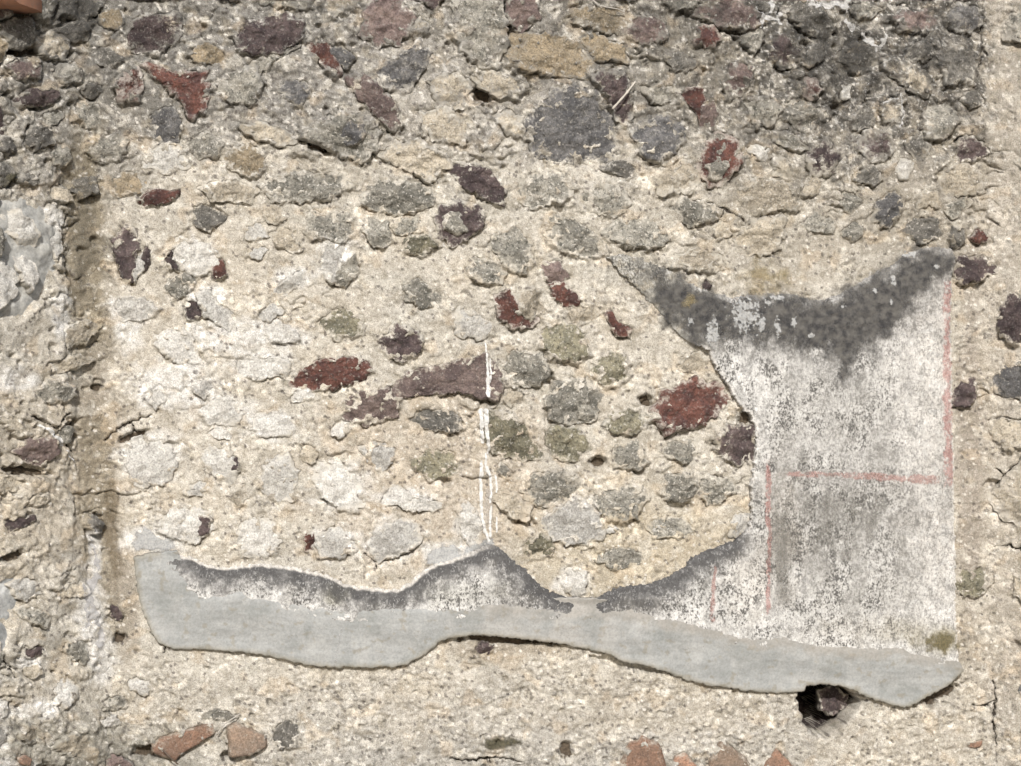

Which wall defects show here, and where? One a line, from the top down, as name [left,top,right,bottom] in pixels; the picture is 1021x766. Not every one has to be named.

water stain [654,248,953,380]
peeling [133,247,964,708]
crack [450,755,521,763]
crack [972,680,997,744]